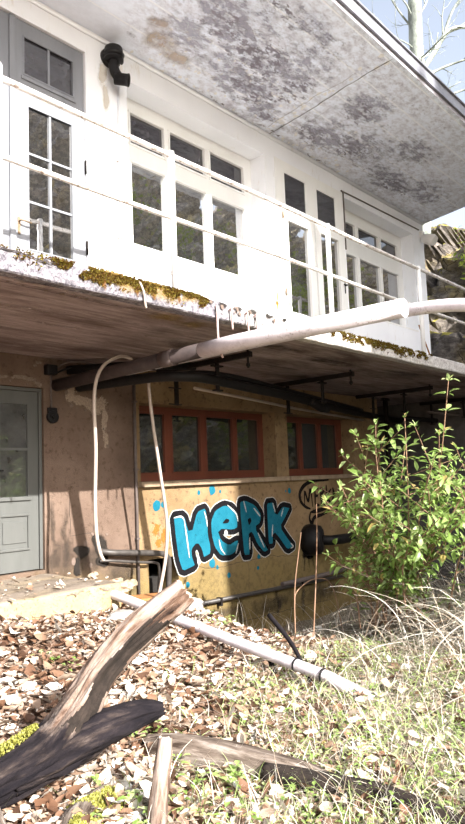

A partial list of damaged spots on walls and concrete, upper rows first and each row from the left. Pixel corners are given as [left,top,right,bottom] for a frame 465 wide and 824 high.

water stain [147,0,333,136]
crack [267,54,390,133]
water stain [298,95,441,202]
flaking render [65,388,110,448]